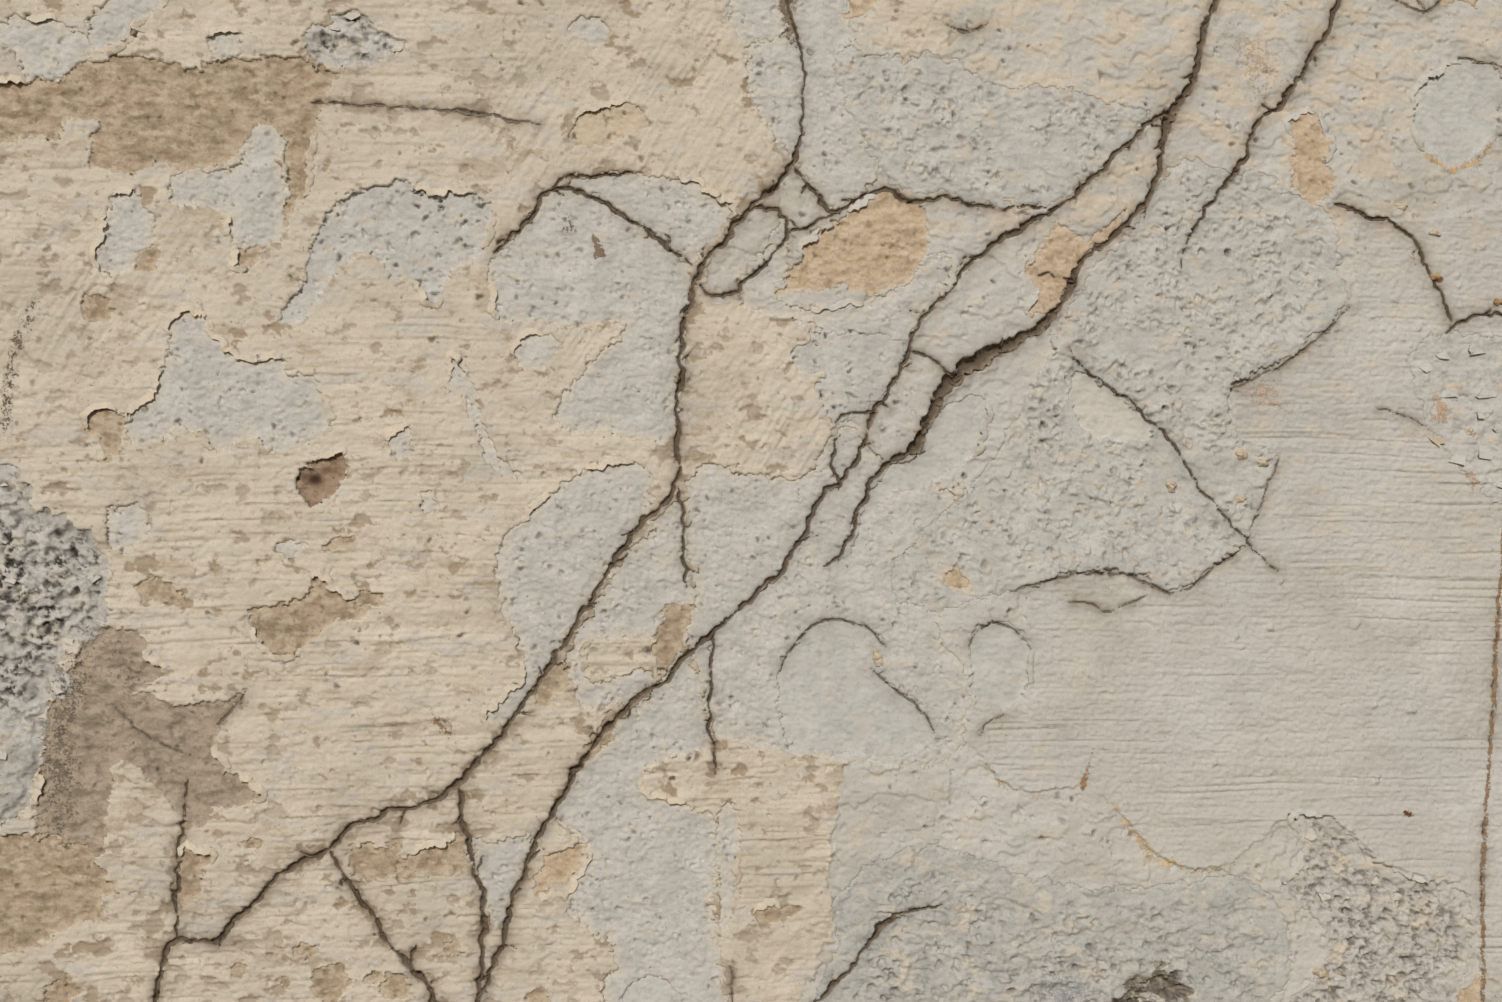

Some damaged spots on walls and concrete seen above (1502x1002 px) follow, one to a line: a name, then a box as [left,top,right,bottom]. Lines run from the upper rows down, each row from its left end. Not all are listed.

spalling [0,0,406,275]
peeling [79,304,348,508]
peeling [274,170,741,444]
peeling [345,0,1035,1002]
crack [114,0,1280,1002]
crack [1180,0,1341,268]
crack [1231,307,1350,389]
crack [1395,0,1441,13]
crack [1334,203,1502,333]
spalling [0,464,268,954]
crack [1489,608,1501,744]
spalling [813,808,1483,1002]